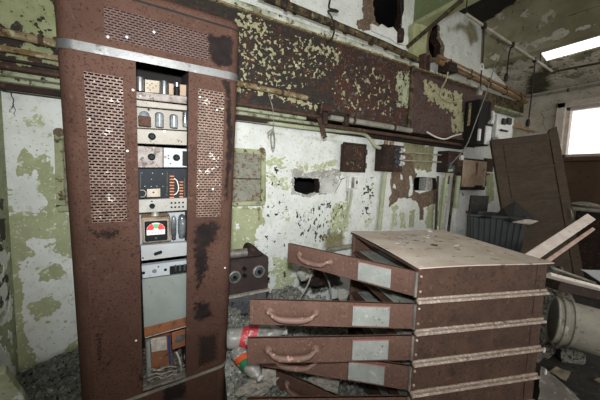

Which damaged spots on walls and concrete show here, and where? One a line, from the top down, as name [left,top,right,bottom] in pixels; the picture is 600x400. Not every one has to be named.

flaking render [356,0,380,31]
peeling [499,24,600,96]
peeling [15,110,45,134]
peeling [230,155,351,250]
flaking render [389,143,450,229]
peeling [0,148,72,376]